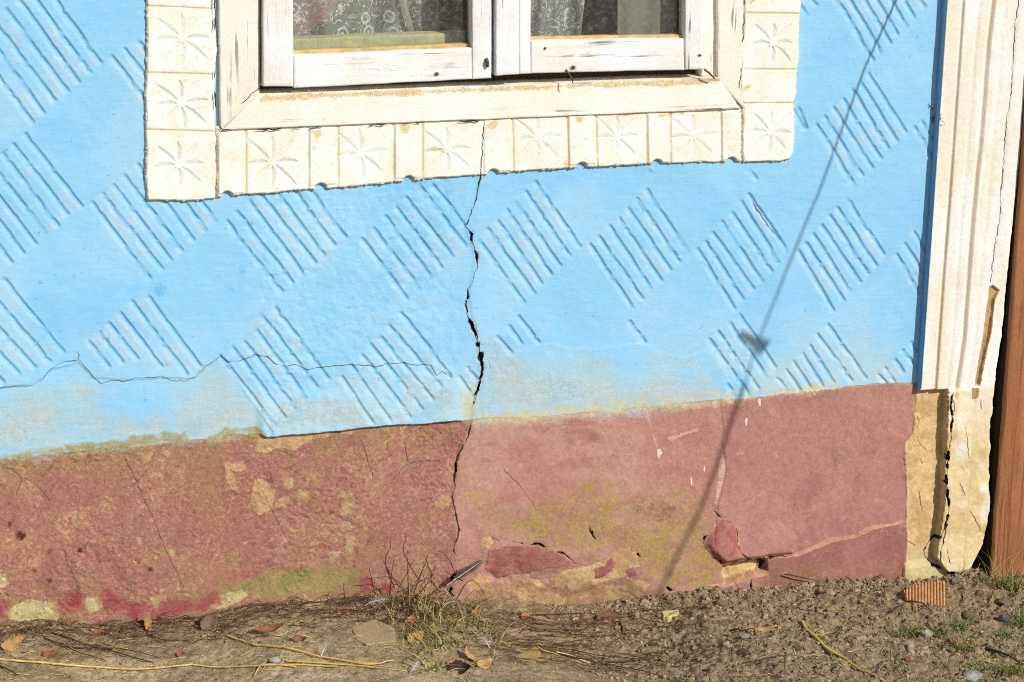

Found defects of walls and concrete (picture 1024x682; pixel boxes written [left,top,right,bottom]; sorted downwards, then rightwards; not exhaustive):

crack [258,124,322,132]
crack [2,353,450,388]
crack [361,119,491,596]
peeling [223,458,312,518]
peeling [324,487,359,564]
spalling [694,392,951,592]
crack [907,394,985,575]
peeling [465,535,676,605]